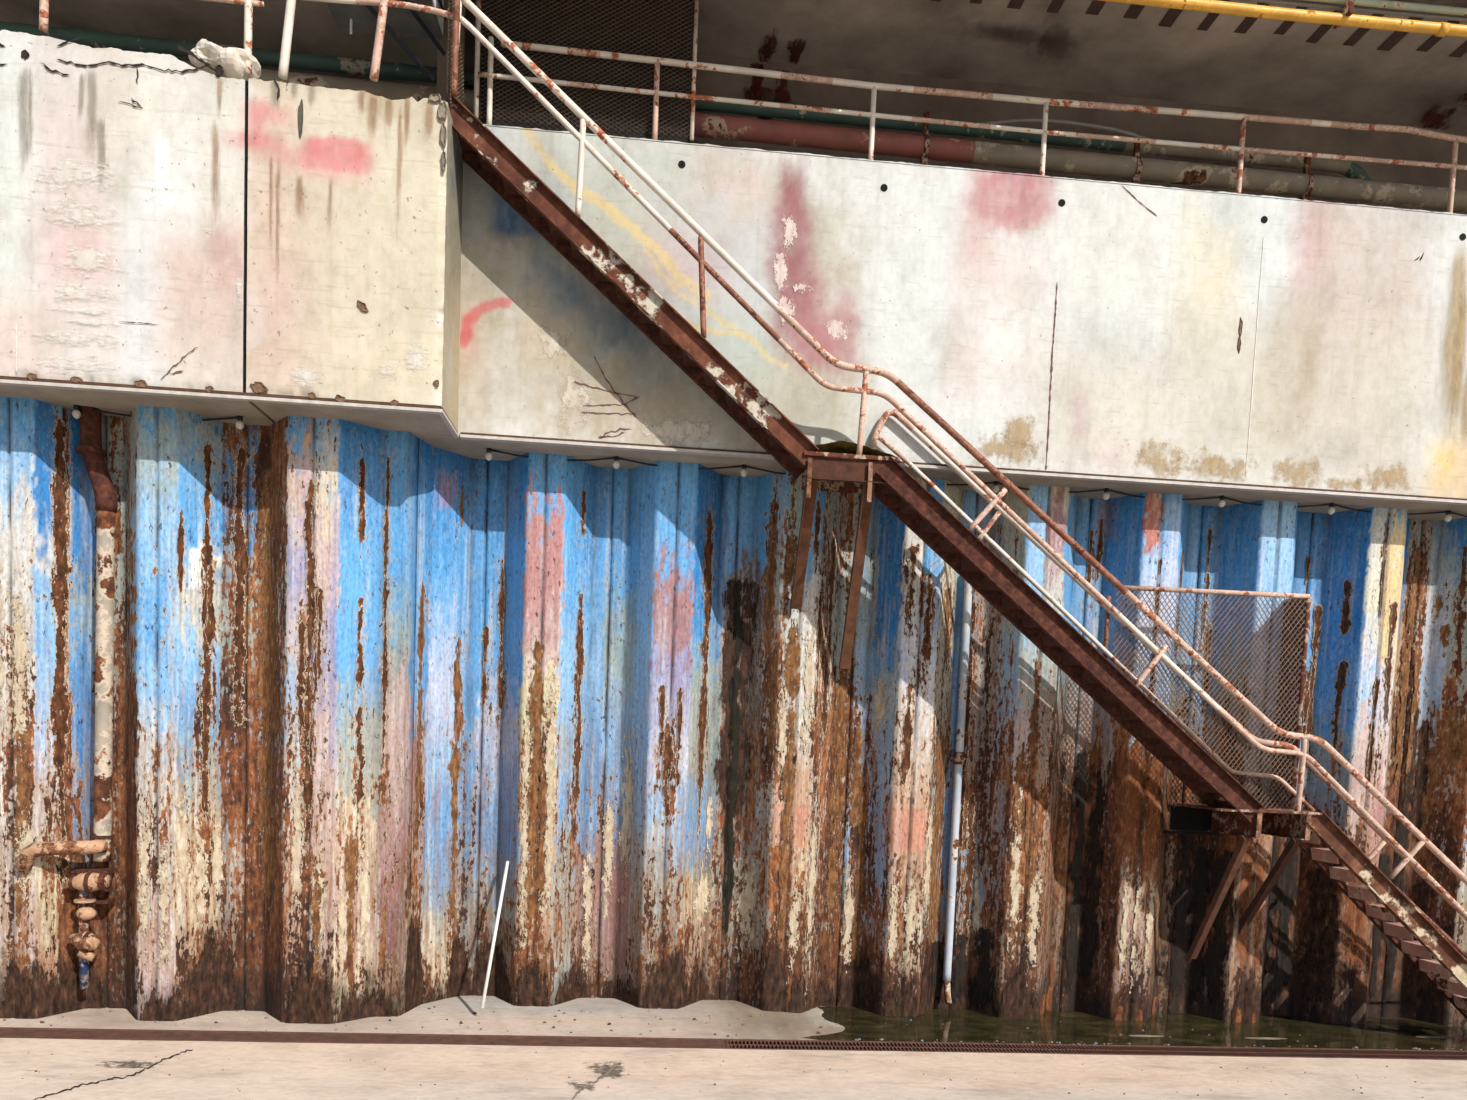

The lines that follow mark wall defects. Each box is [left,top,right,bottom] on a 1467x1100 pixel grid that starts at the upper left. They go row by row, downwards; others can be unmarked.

crack [574,356,638,439]
water stain [1446,259,1467,426]
rust [49,418,77,904]
peeling [136,743,225,984]
rust [176,440,324,929]
peeling [289,758,373,994]
rust [351,456,390,806]
peeling [517,658,559,974]
water stain [713,578,761,960]
rust [899,461,1467,785]
crack [34,1049,193,1100]
crack [572,1062,621,1100]